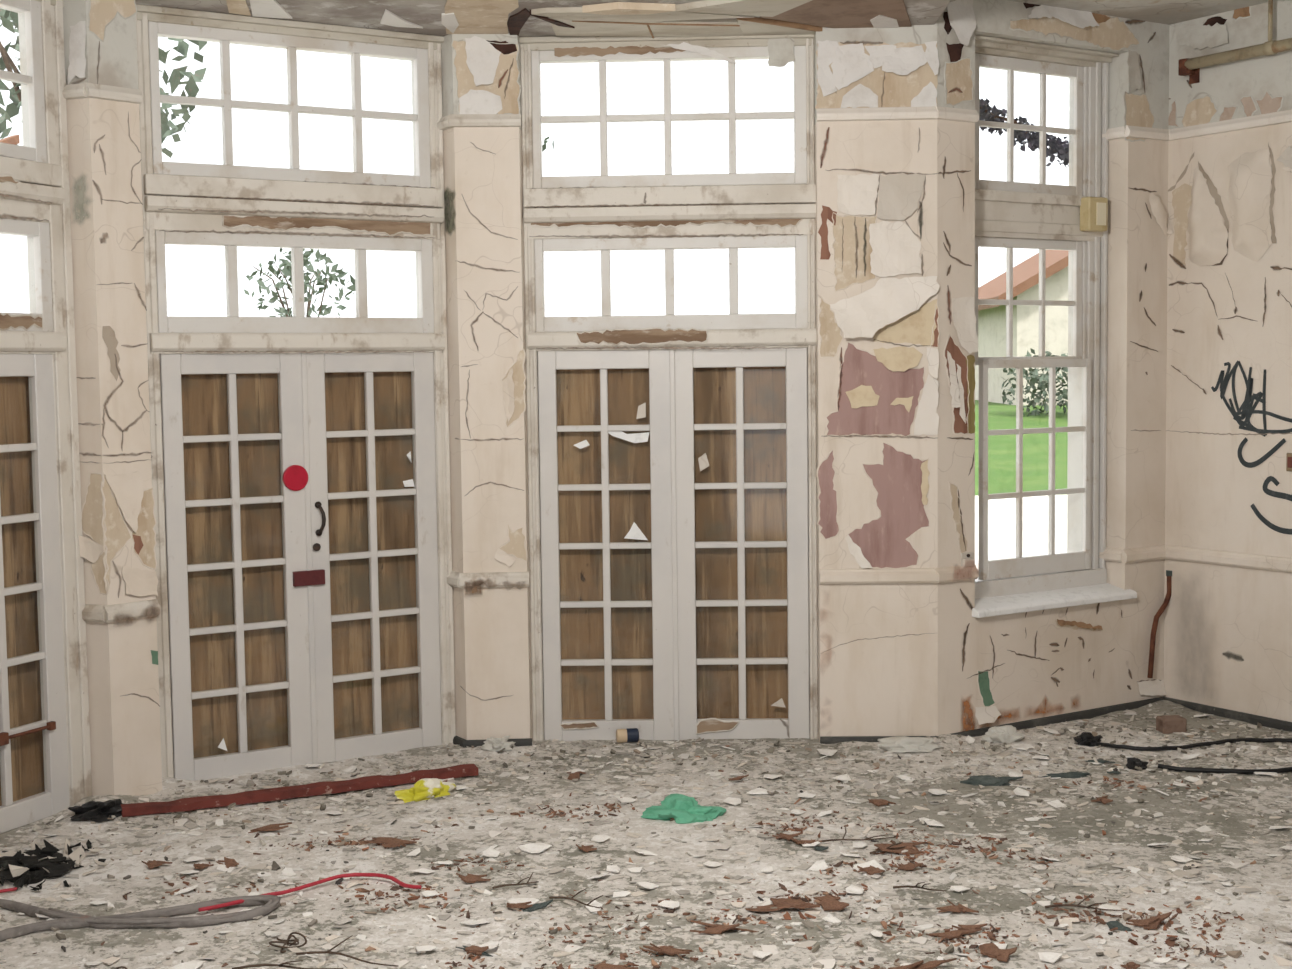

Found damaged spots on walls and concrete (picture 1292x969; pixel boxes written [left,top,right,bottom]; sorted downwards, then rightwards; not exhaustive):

peeling [226,0,292,19]
peeling [380,9,423,28]
peeling [441,0,976,114]
crack [93,114,803,251]
crack [1130,188,1157,218]
crack [77,326,151,463]
crack [177,347,432,355]
crack [455,261,780,441]
peeling [816,173,979,569]
crack [1130,254,1292,394]
peeling [78,471,158,598]
peeling [975,670,1001,725]